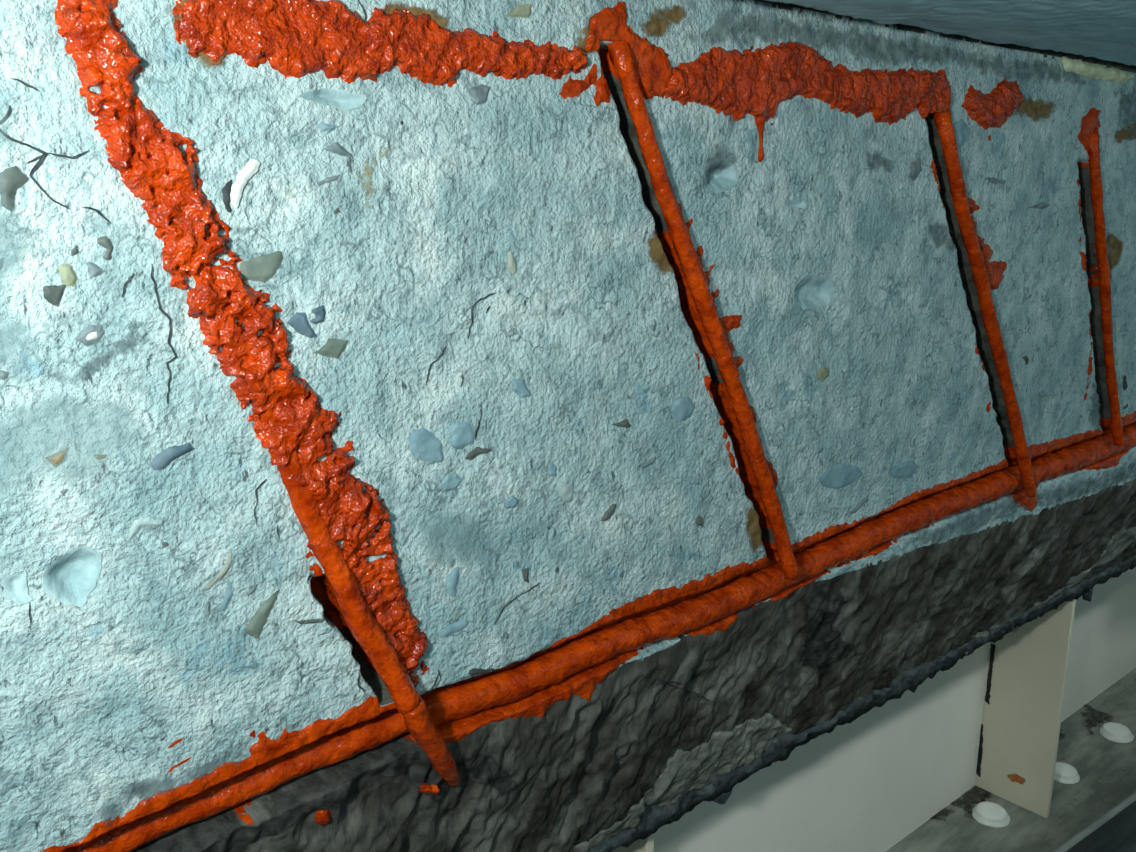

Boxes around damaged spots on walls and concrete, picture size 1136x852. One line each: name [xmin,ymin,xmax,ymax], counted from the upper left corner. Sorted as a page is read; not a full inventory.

corrosion [383,4,447,27]
corrosion [642,6,686,36]
corrosion [1017,97,1054,121]
corrosion [648,231,674,274]
corrosion [1107,233,1124,270]
spalling [421,2,1136,744]
spalling [40,0,461,852]
corrosion [747,508,762,552]
spalling [0,545,102,607]
spalling [587,555,1136,852]
corrosion [386,734,450,803]
corrosion [931,785,991,821]